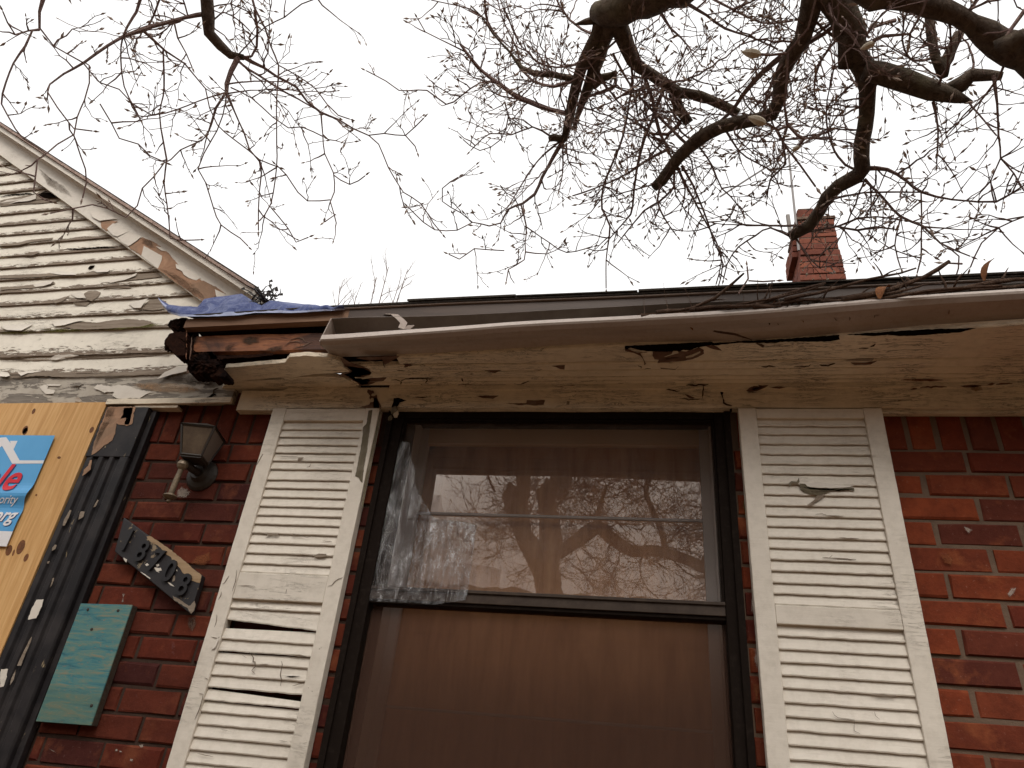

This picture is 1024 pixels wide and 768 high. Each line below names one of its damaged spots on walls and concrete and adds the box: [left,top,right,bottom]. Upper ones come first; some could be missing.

peeling [1,194,36,204]
peeling [0,210,225,329]
peeling [625,342,722,370]
peeling [478,370,570,408]
peeling [141,536,202,614]
spalling [28,599,44,620]
spalling [0,637,32,687]
crack [244,652,306,686]